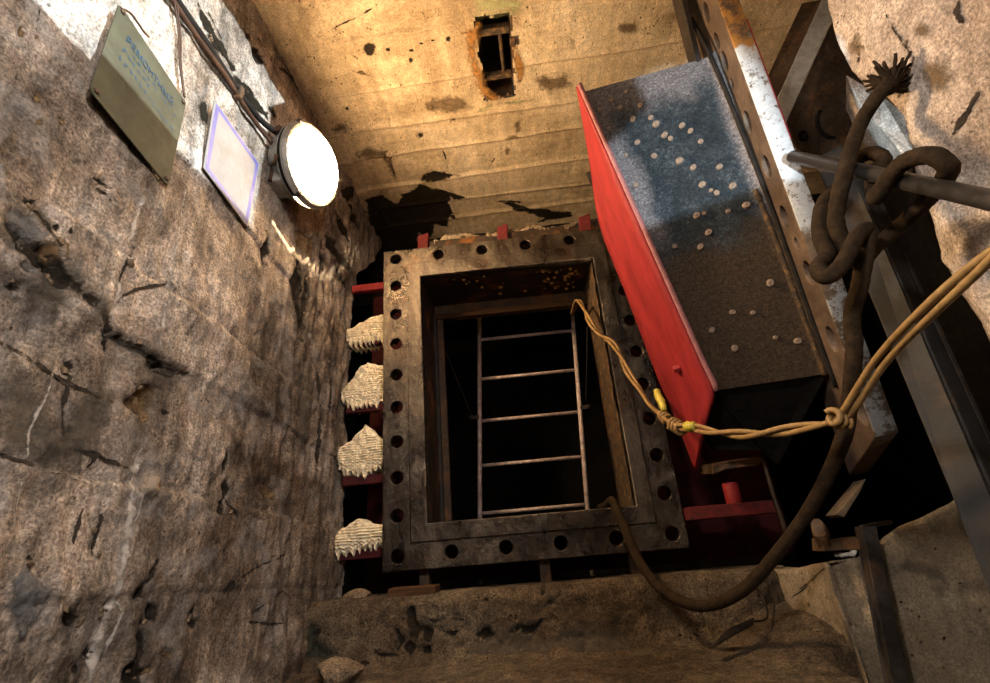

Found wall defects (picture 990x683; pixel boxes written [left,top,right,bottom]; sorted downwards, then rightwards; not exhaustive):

damp [426,96,466,112]
corrosion [461,24,508,101]
corrosion [513,47,524,83]
damp [537,76,570,90]
crack [3,199,189,383]
crack [0,340,129,484]